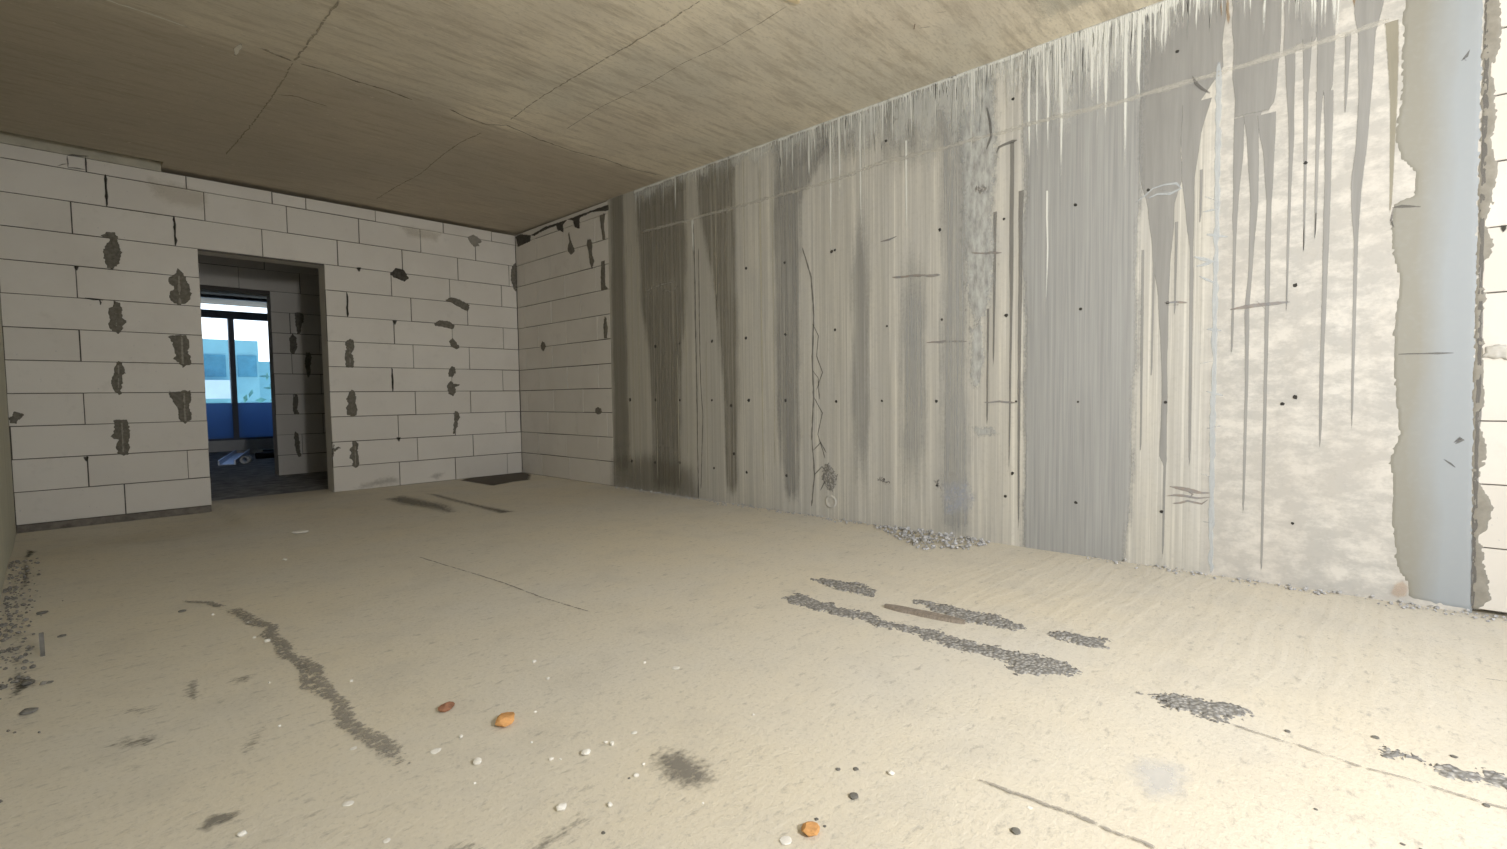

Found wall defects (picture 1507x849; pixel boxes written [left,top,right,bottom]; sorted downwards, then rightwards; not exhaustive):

crack [802,248,827,506]
damp [626,0,1399,568]